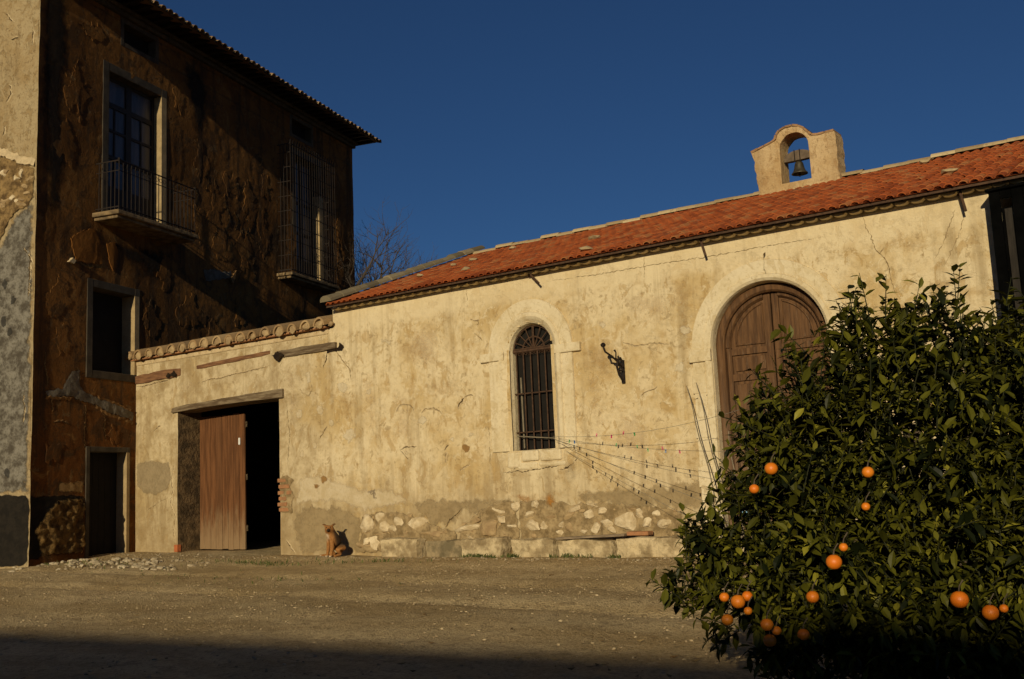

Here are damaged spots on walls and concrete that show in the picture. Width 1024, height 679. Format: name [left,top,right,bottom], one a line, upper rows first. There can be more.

crack [863,218,895,291]
spalling [45,370,134,445]
spalling [277,475,294,513]